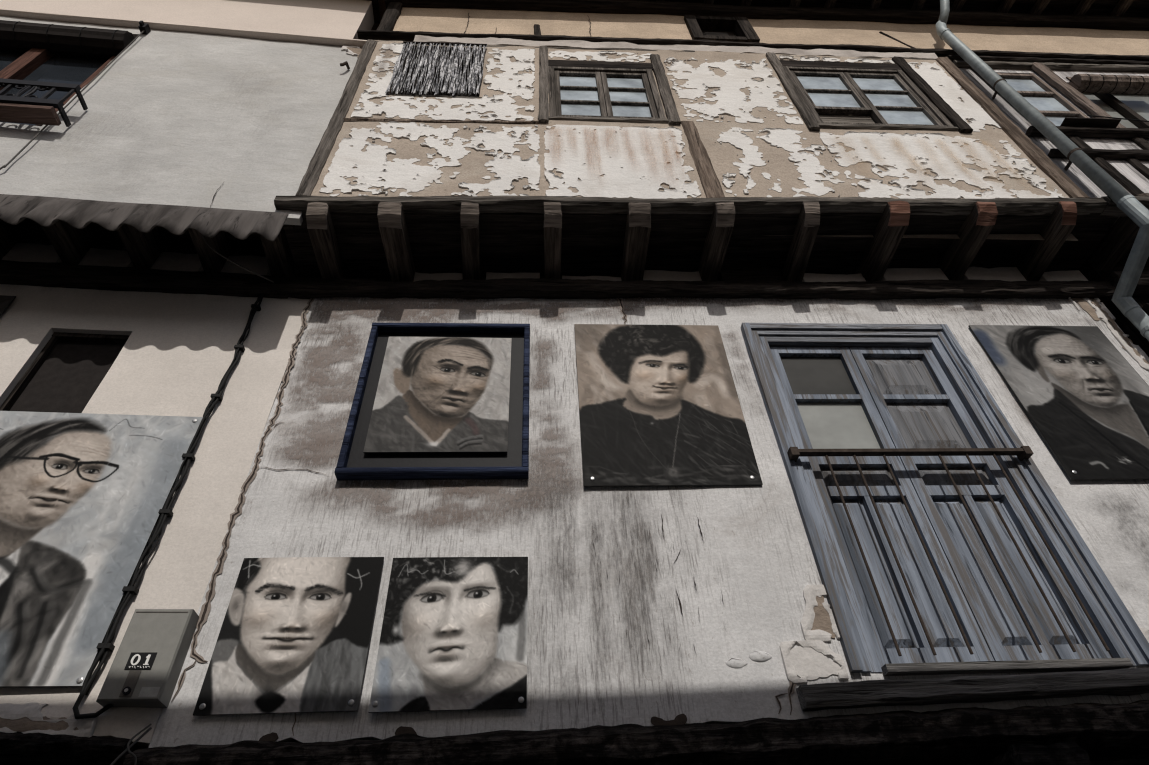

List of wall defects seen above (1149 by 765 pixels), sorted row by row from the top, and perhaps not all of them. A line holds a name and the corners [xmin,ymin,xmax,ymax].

peeling [319,43,1066,199]
crack [171,298,326,702]
spalling [779,584,849,684]